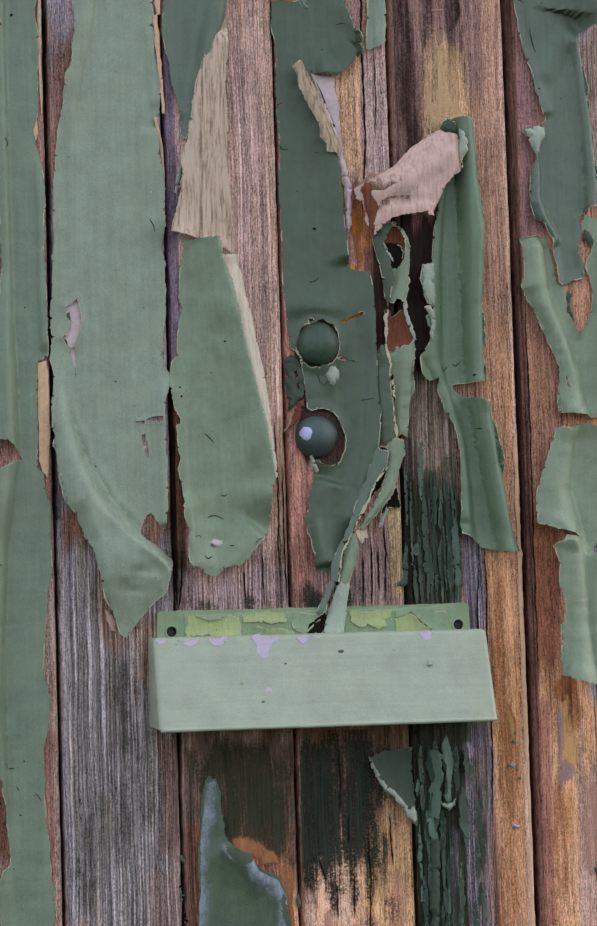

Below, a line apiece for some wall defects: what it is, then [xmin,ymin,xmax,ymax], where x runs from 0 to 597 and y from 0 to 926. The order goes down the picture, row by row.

peeling [0,0,278,926]
peeling [177,0,520,658]
peeling [513,0,597,684]
peeling [197,776,295,926]
damp [190,729,398,917]
peeling [369,735,487,926]